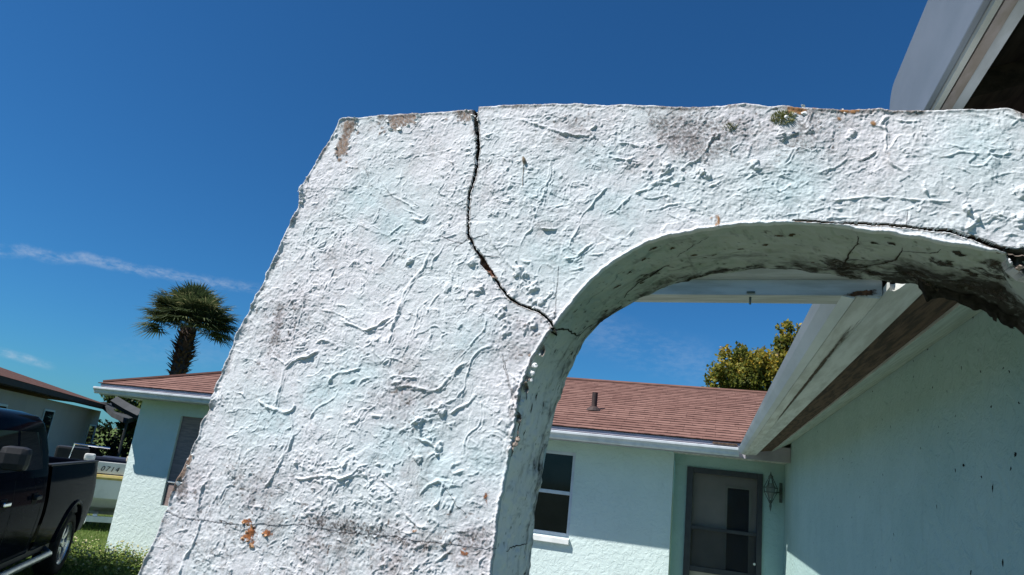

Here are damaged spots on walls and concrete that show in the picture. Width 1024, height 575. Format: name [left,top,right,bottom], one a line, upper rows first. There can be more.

peeling [334,117,359,163]
crack [442,108,707,338]
water stain [789,257,883,279]
crack [793,214,1024,268]
water stain [901,251,1018,307]
corrosion [241,519,273,548]